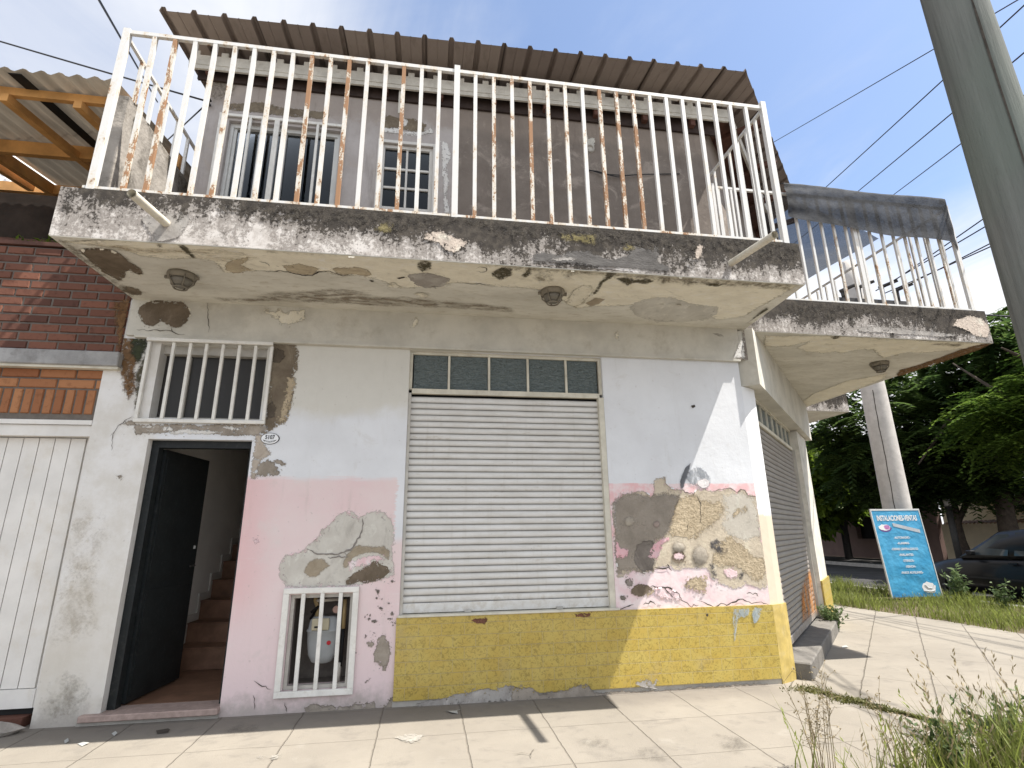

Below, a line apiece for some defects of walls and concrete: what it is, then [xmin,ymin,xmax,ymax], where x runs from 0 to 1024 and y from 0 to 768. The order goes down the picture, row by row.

peeling [62,229,799,328]
damp [212,200,799,306]
peeling [763,315,989,358]
flaking render [124,344,299,479]
crack [308,518,364,559]
peeling [279,510,395,671]
peeling [612,476,768,603]
crack [621,564,769,609]
spalling [417,673,768,706]